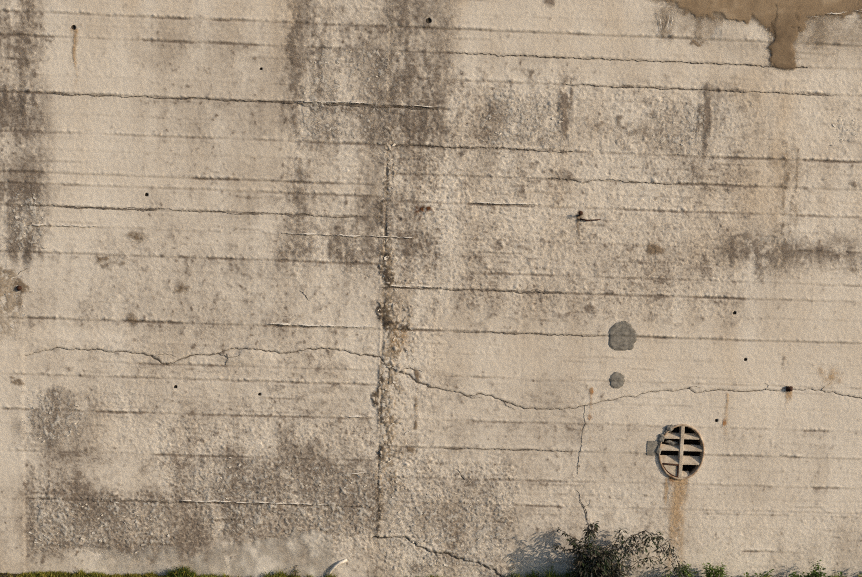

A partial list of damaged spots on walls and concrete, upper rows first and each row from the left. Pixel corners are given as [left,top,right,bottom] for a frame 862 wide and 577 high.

water stain [560,89,573,133]
water stain [696,85,711,148]
water stain [647,244,664,254]
water stain [722,234,852,273]
spalling [0,267,25,333]
crack [25,347,277,365]
crack [301,347,861,476]
water stain [53,502,132,553]
water stain [221,454,366,518]
rust [665,477,687,544]